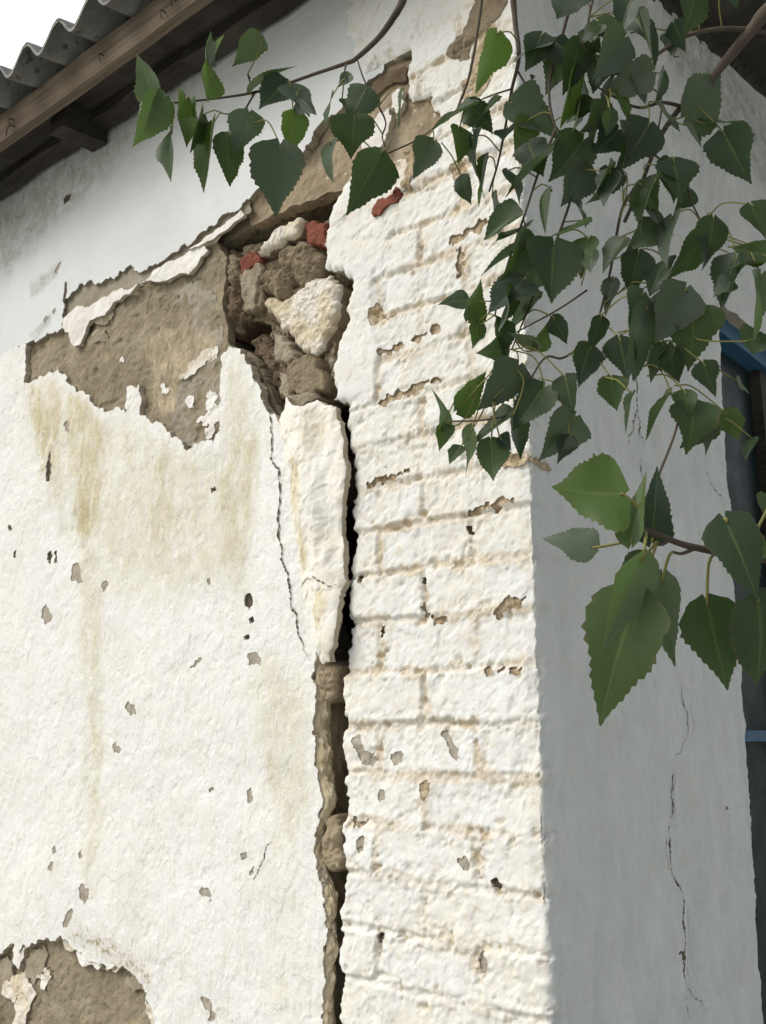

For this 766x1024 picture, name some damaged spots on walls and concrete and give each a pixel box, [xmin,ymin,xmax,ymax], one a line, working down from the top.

flaking render [446,0,508,100]
flaking render [371,150,415,217]
flaking render [28,211,247,450]
spalling [368,303,385,326]
leakage [150,332,215,412]
flaking render [71,563,83,583]
crack [267,396,350,1024]
spalling [351,734,403,767]
spalling [441,731,459,761]
spalling [420,780,430,802]
crack [667,701,703,1022]
flaking render [0,940,155,1024]